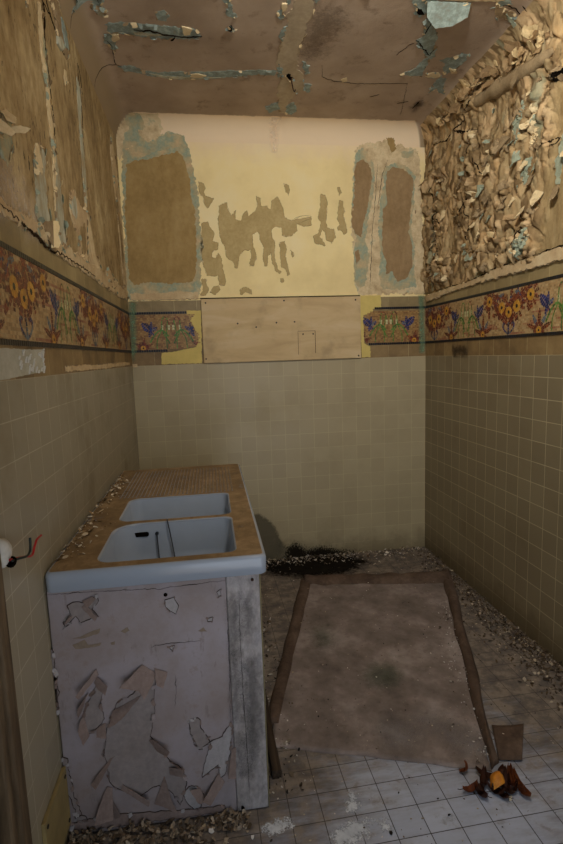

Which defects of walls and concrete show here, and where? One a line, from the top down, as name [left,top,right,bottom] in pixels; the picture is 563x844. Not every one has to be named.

crack [133,29,202,41]
flaking render [0,0,563,365]
peeling [0,348,46,380]
peeling [65,362,130,372]
water stain [254,514,286,560]